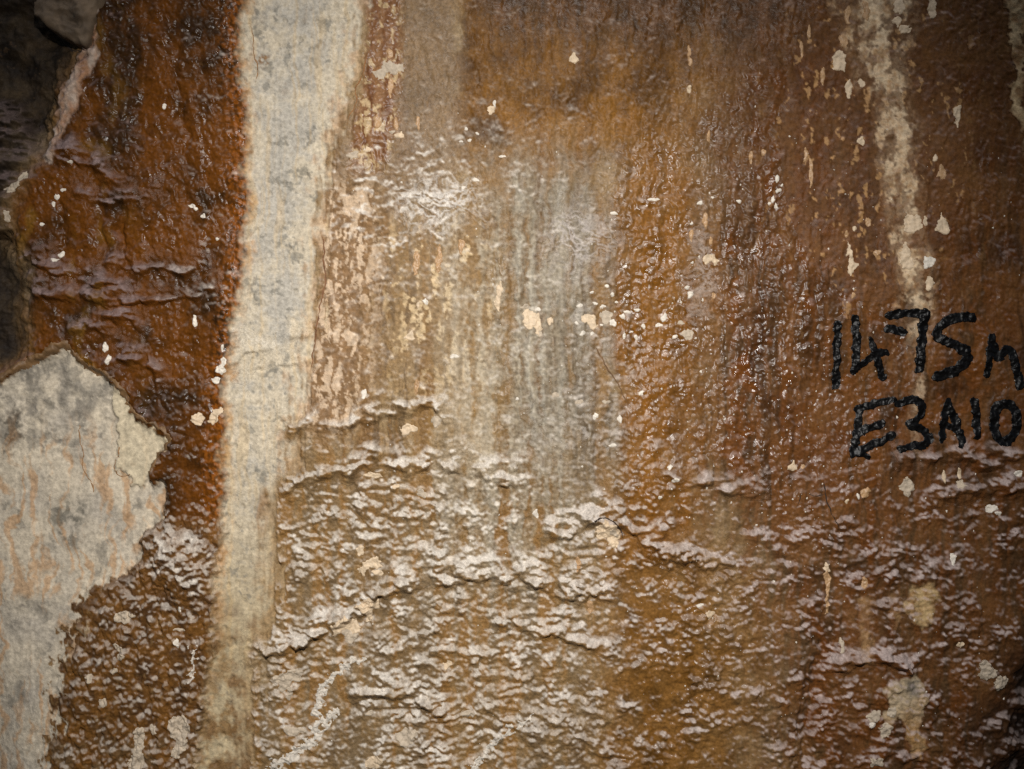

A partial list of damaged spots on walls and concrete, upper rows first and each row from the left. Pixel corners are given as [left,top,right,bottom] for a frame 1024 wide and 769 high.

peeling [371,48,404,98]
peeling [374,114,404,138]
water stain [1003,0,1024,152]
corrosion [0,0,249,769]
peeling [400,423,418,436]
water stain [192,0,969,769]
spalling [0,340,172,769]
peeling [127,715,190,769]
water stain [953,617,1024,769]